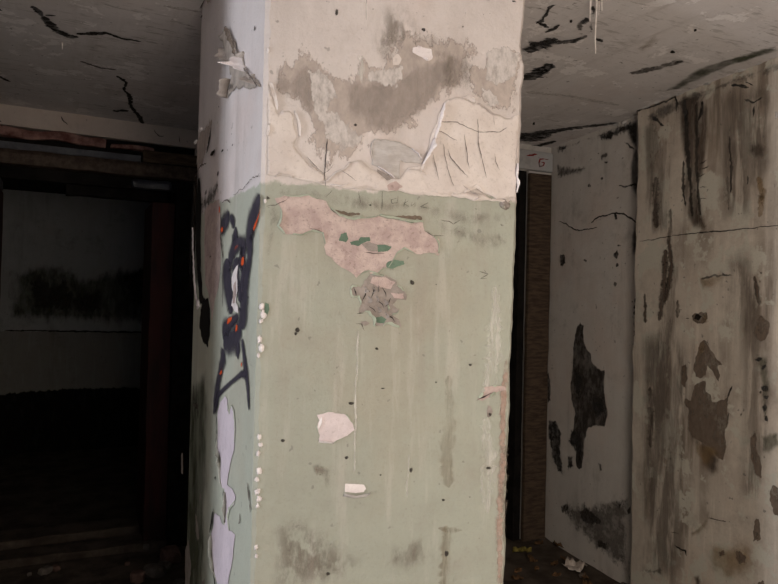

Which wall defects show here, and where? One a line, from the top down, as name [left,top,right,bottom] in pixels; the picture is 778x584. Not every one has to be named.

flaking render [214,26,522,202]
peeling [259,302,269,324]
peeling [264,194,440,329]
peeling [254,467,262,508]